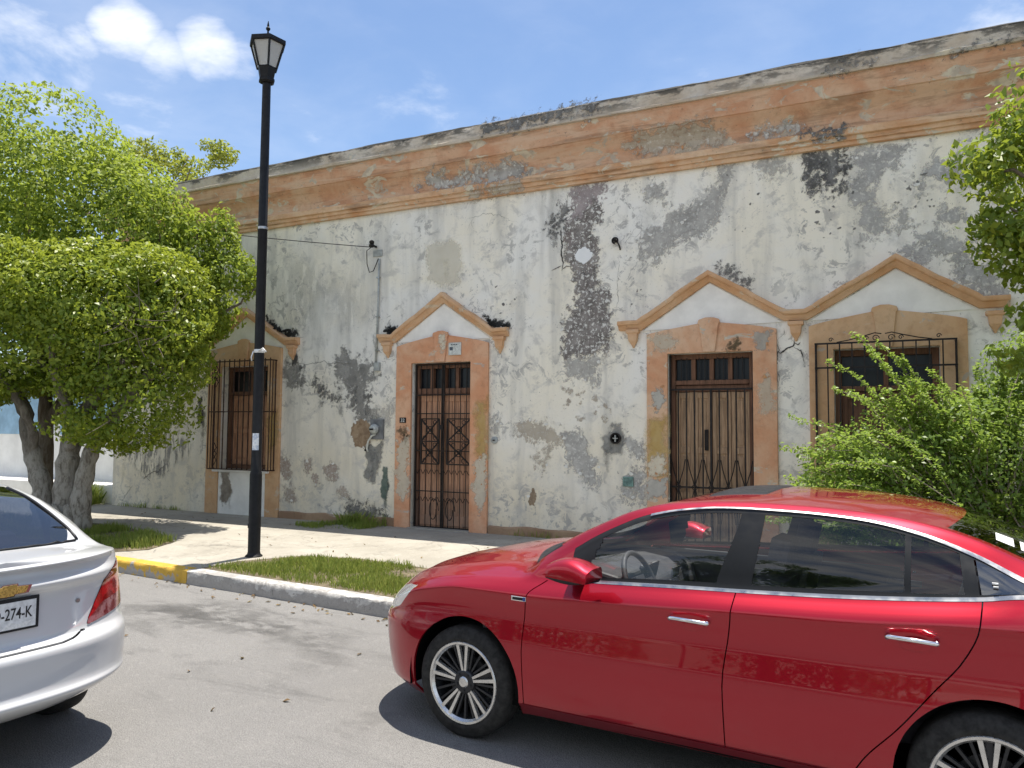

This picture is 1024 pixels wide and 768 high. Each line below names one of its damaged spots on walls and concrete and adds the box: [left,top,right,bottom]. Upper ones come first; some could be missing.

spalling [620,115,734,158]
peeling [636,163,737,267]
peeling [813,142,1010,296]
spalling [513,181,615,489]
crack [777,331,805,386]
peeling [617,385,670,512]